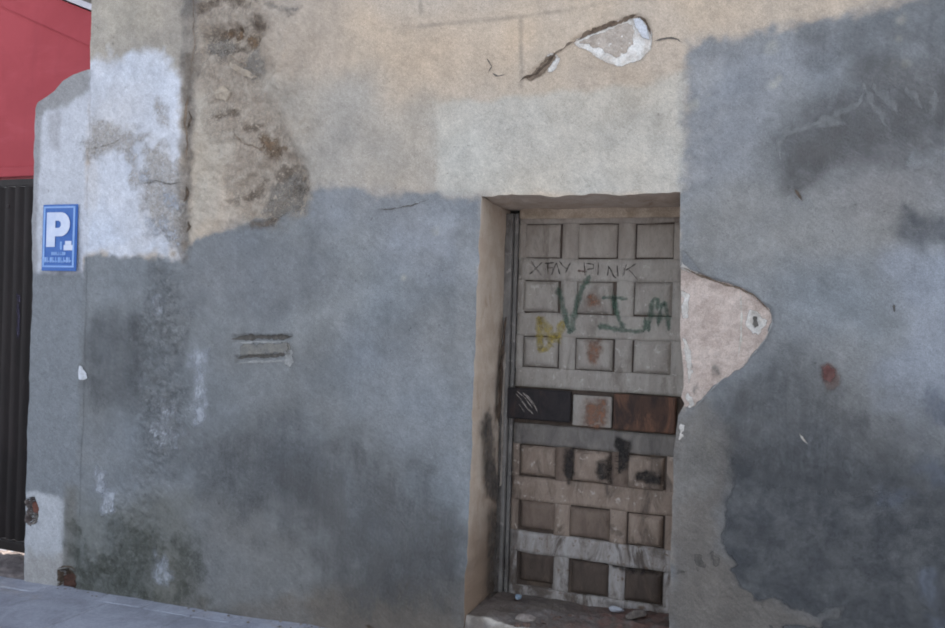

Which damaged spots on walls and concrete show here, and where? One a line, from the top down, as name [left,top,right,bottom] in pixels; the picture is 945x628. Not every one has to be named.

flaking render [195,0,310,227]
flaking render [521,15,681,81]
flaking render [680,251,773,409]
corrosion [822,363,839,389]
water stain [95,472,115,513]
water stain [154,558,172,584]
water stain [482,412,501,598]
water stain [721,393,945,628]